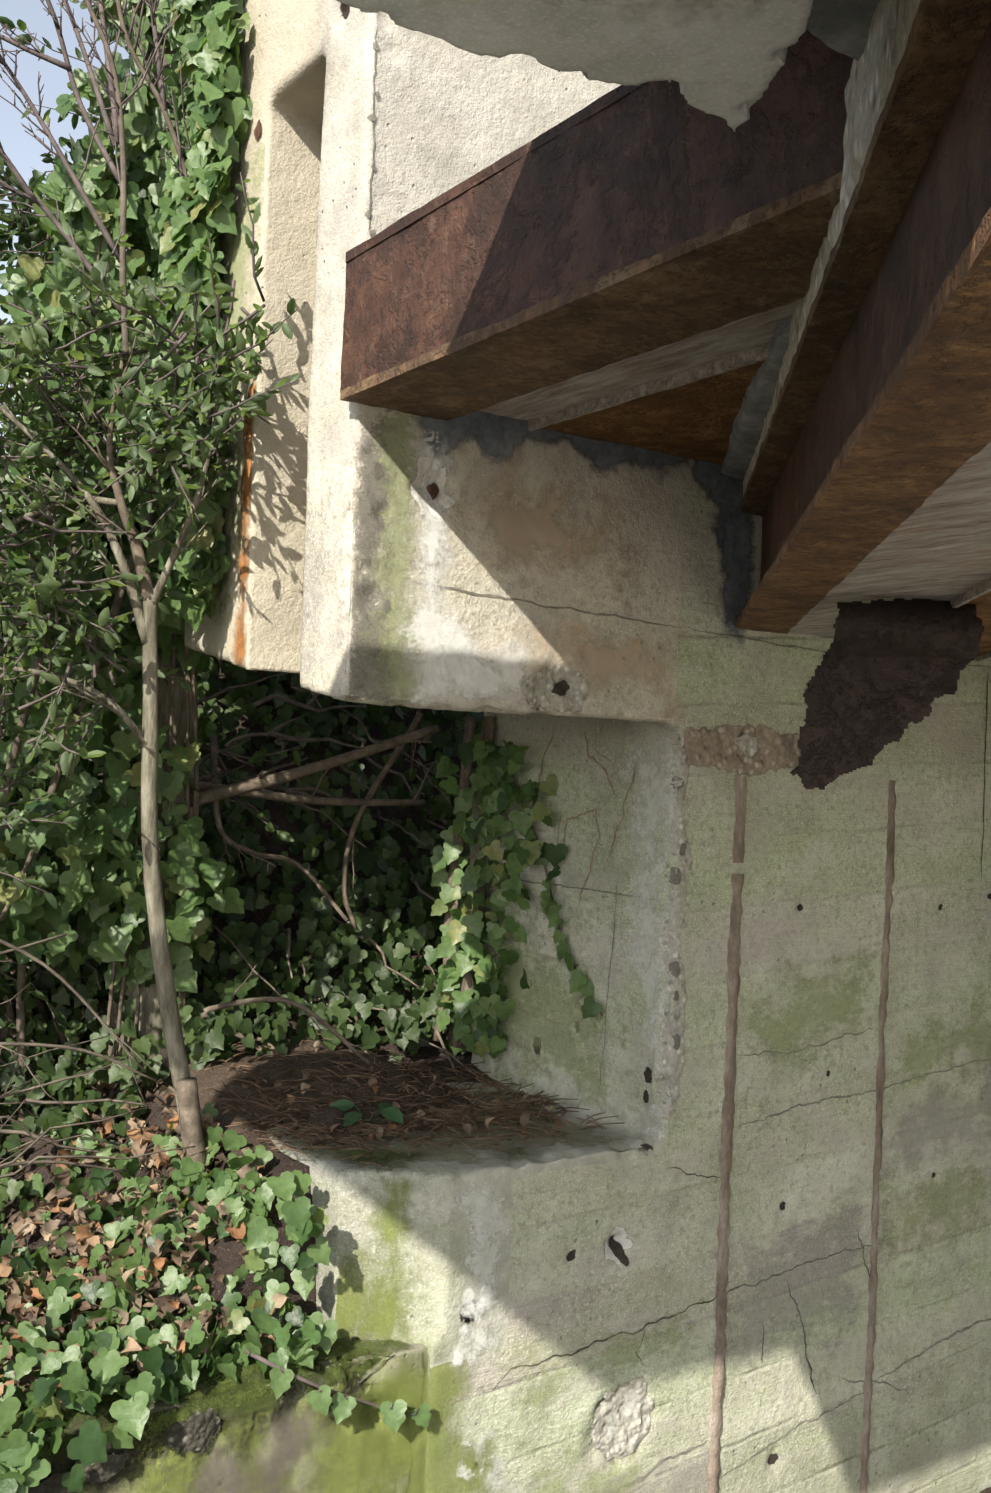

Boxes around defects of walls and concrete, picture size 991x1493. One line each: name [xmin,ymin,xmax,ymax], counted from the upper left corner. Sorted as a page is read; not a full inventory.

corrosion [234,384,256,665]
water stain [399,411,754,703]
crack [415,582,826,652]
spalling [521,653,590,713]
spalling [643,724,801,1120]
crack [493,1231,908,1394]
water stain [328,1356,363,1399]
water stain [28,1390,291,1493]
water stain [449,1431,513,1493]